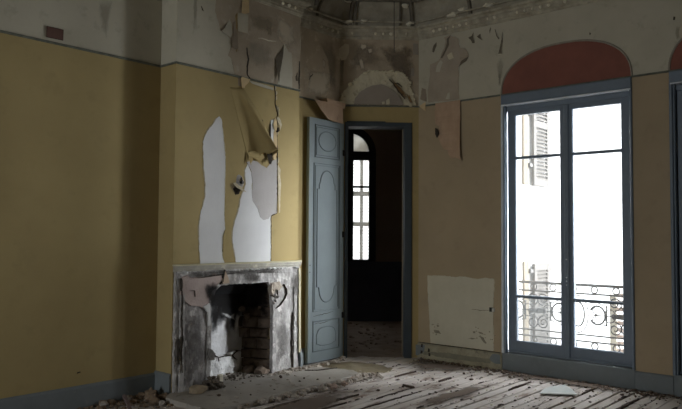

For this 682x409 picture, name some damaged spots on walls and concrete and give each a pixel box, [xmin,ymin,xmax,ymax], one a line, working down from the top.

flaking render [339,70,417,107]
spalling [233,175,246,195]
flaking render [180,271,229,380]
spalling [268,281,282,373]
peeling [420,275,496,356]